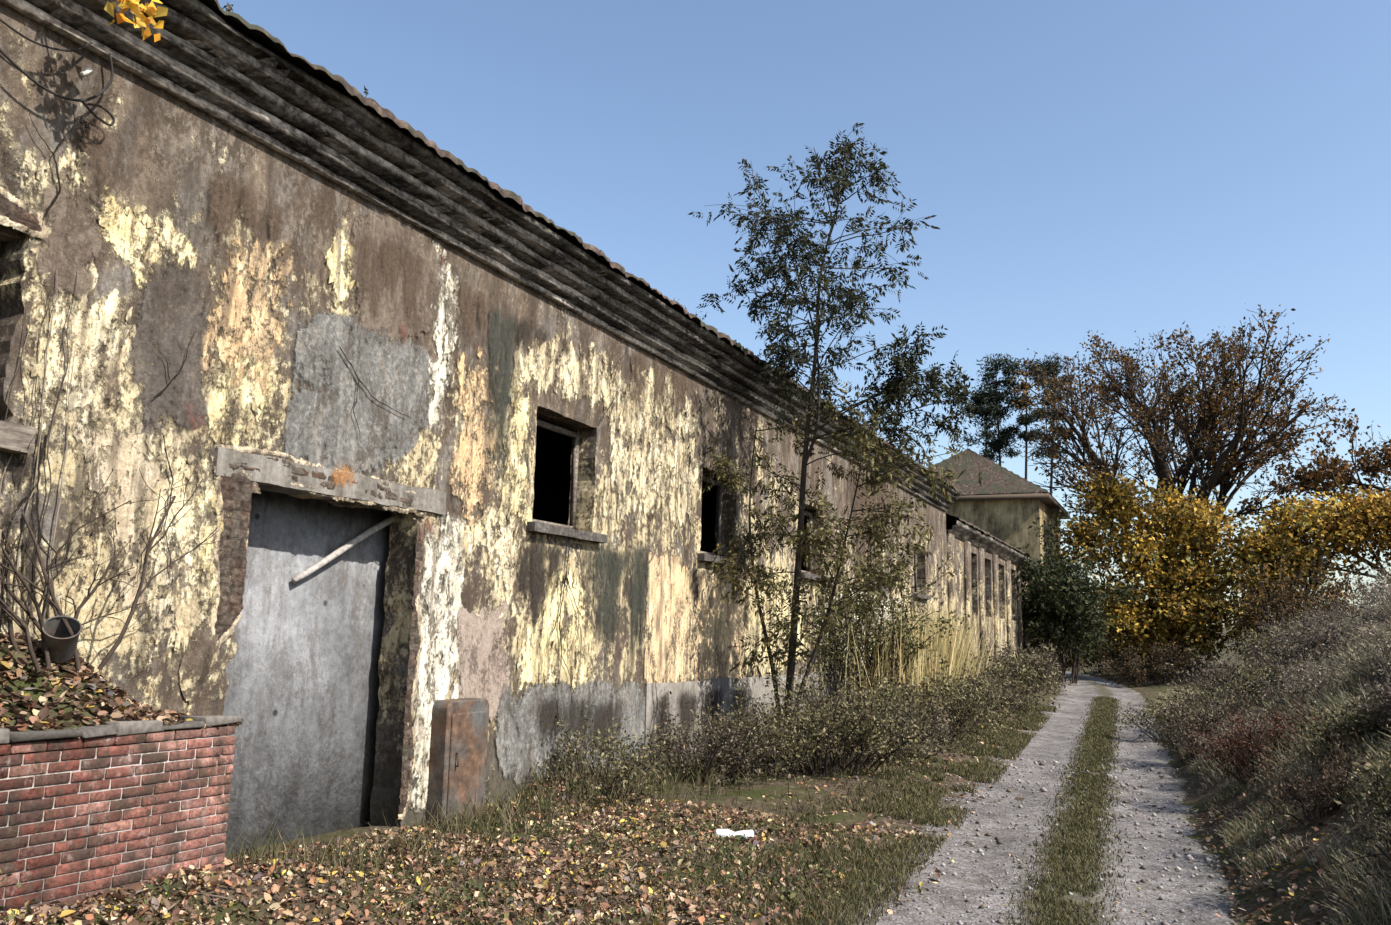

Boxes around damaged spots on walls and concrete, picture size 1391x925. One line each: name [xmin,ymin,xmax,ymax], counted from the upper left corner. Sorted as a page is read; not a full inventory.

peeling [0,137,901,820]
leakage [516,542,562,633]
leakage [584,543,649,654]
leakage [541,698,622,753]
leakage [656,686,750,744]